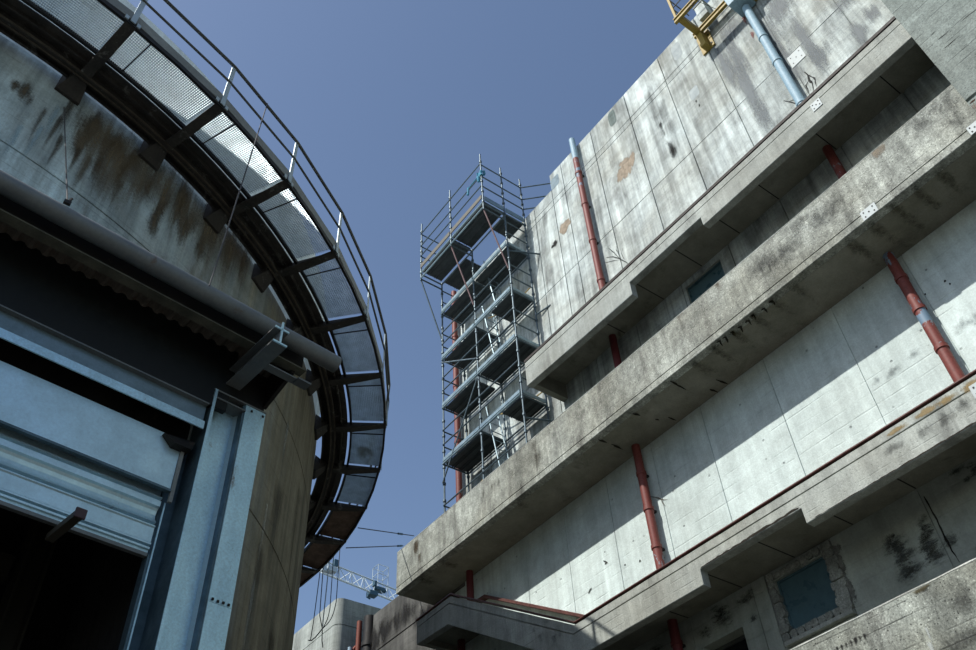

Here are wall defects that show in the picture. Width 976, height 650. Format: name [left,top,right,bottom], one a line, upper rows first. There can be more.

damp [11,81,31,100]
damp [32,101,248,282]
damp [886,516,956,579]
crack [924,497,960,562]